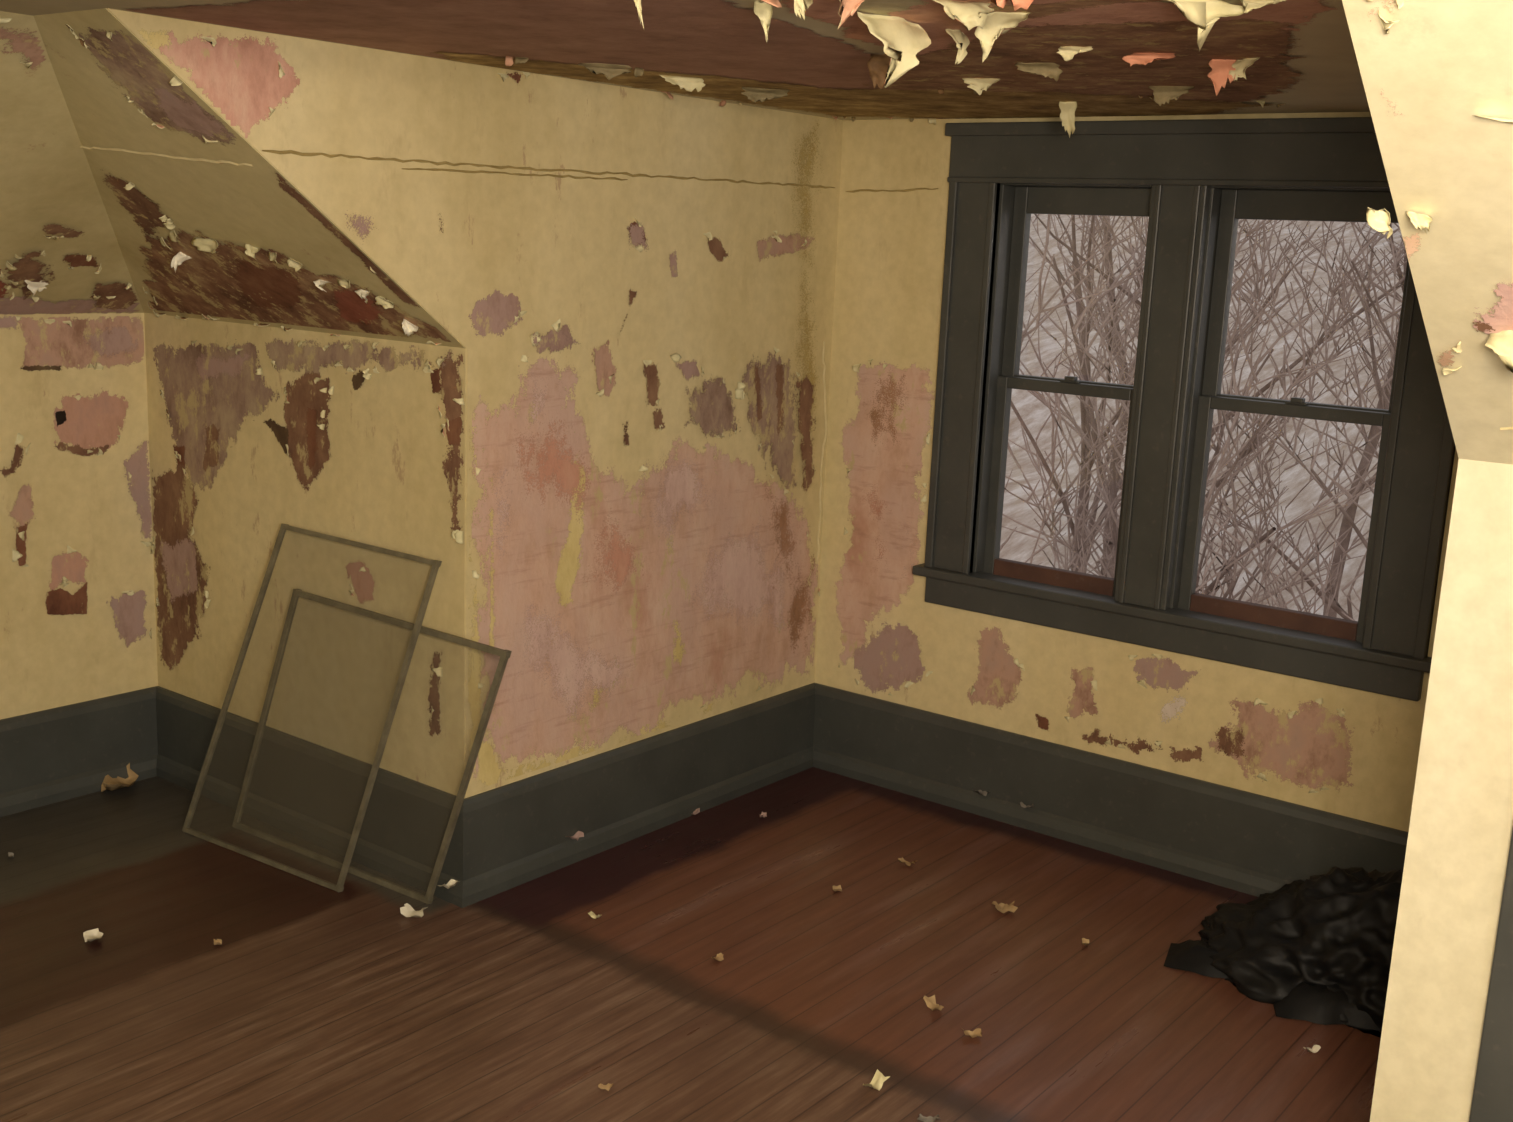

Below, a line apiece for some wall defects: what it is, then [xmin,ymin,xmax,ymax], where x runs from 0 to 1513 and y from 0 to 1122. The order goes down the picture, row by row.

peeling [0,18,46,69]
peeling [65,0,1337,145]
peeling [1366,0,1405,34]
peeling [1366,207,1432,260]
peeling [1436,340,1462,375]
peeling [1473,281,1513,373]
peeling [0,169,935,787]
peeling [967,627,1025,708]
peeling [1128,654,1201,723]
peeling [1035,667,1354,793]